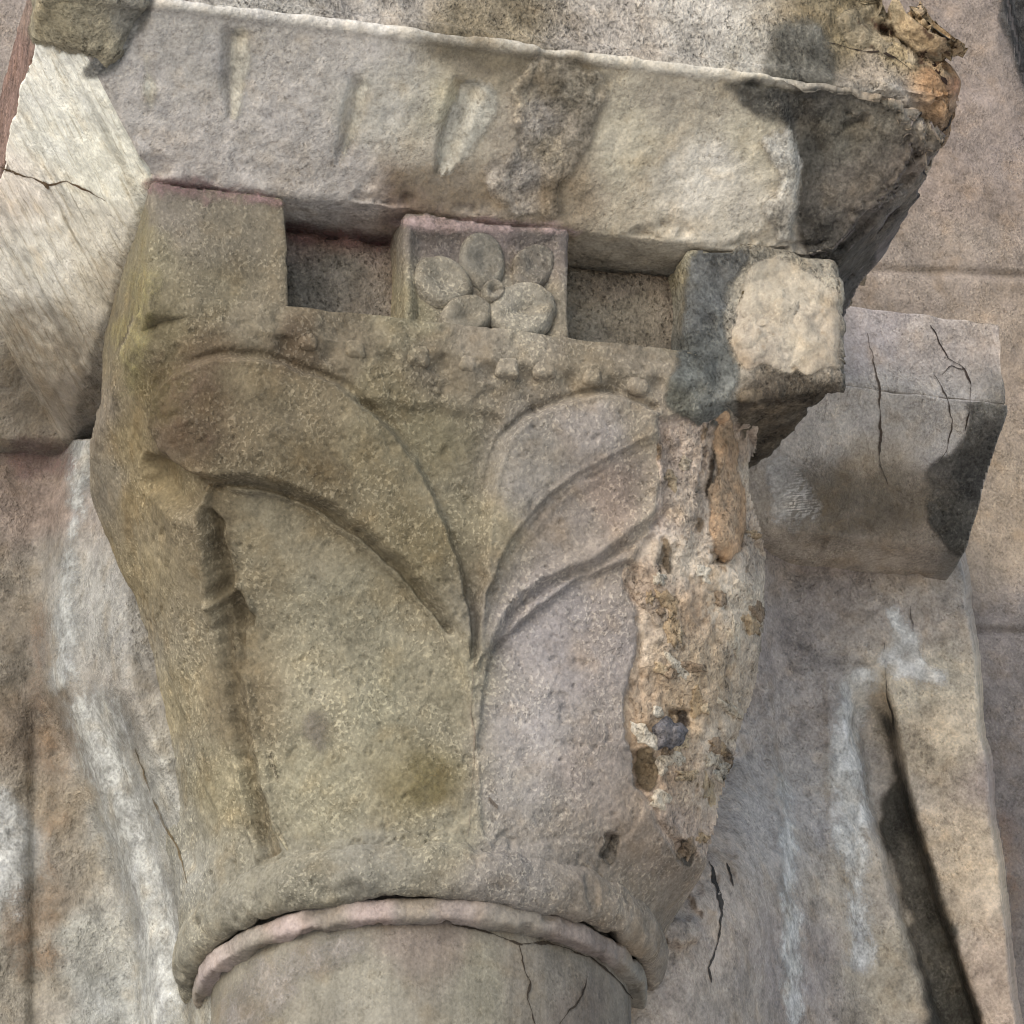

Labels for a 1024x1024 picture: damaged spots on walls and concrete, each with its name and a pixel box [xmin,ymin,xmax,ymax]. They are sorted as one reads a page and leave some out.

spalling [836,1,964,113]
crack [0,167,105,201]
damp [666,248,748,426]
crack [867,333,888,484]
crack [930,325,971,457]
damp [766,401,1007,557]
spalling [622,411,766,867]
spalling [602,835,619,865]
crack [451,924,633,1024]
crack [708,861,734,983]